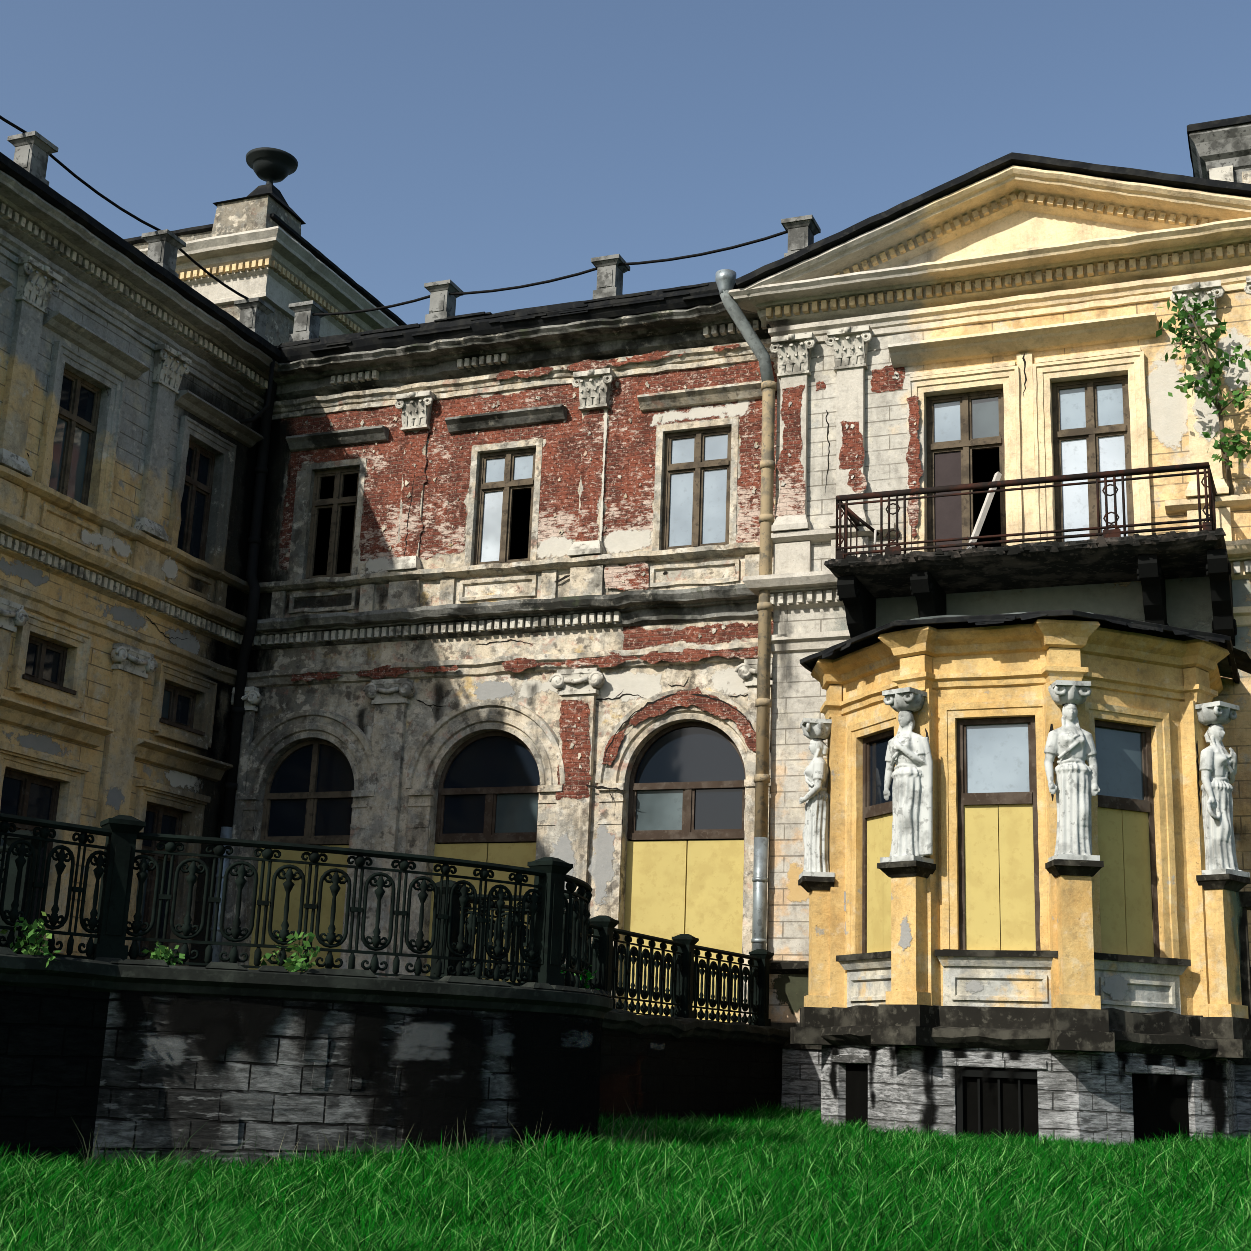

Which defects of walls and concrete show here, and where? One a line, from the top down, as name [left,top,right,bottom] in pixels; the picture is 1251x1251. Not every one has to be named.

peeling [1146,327,1251,449]
peeling [279,343,826,590]
peeling [838,421,867,493]
peeling [870,365,924,539]
peeling [0,557,49,586]
peeling [474,621,773,800]
water stain [114,990,330,1067]
water stain [347,1001,603,1154]
water stain [829,1045,839,1098]
water stain [868,1045,900,1108]
water stain [919,1046,967,1136]
water stain [1145,1054,1228,1144]